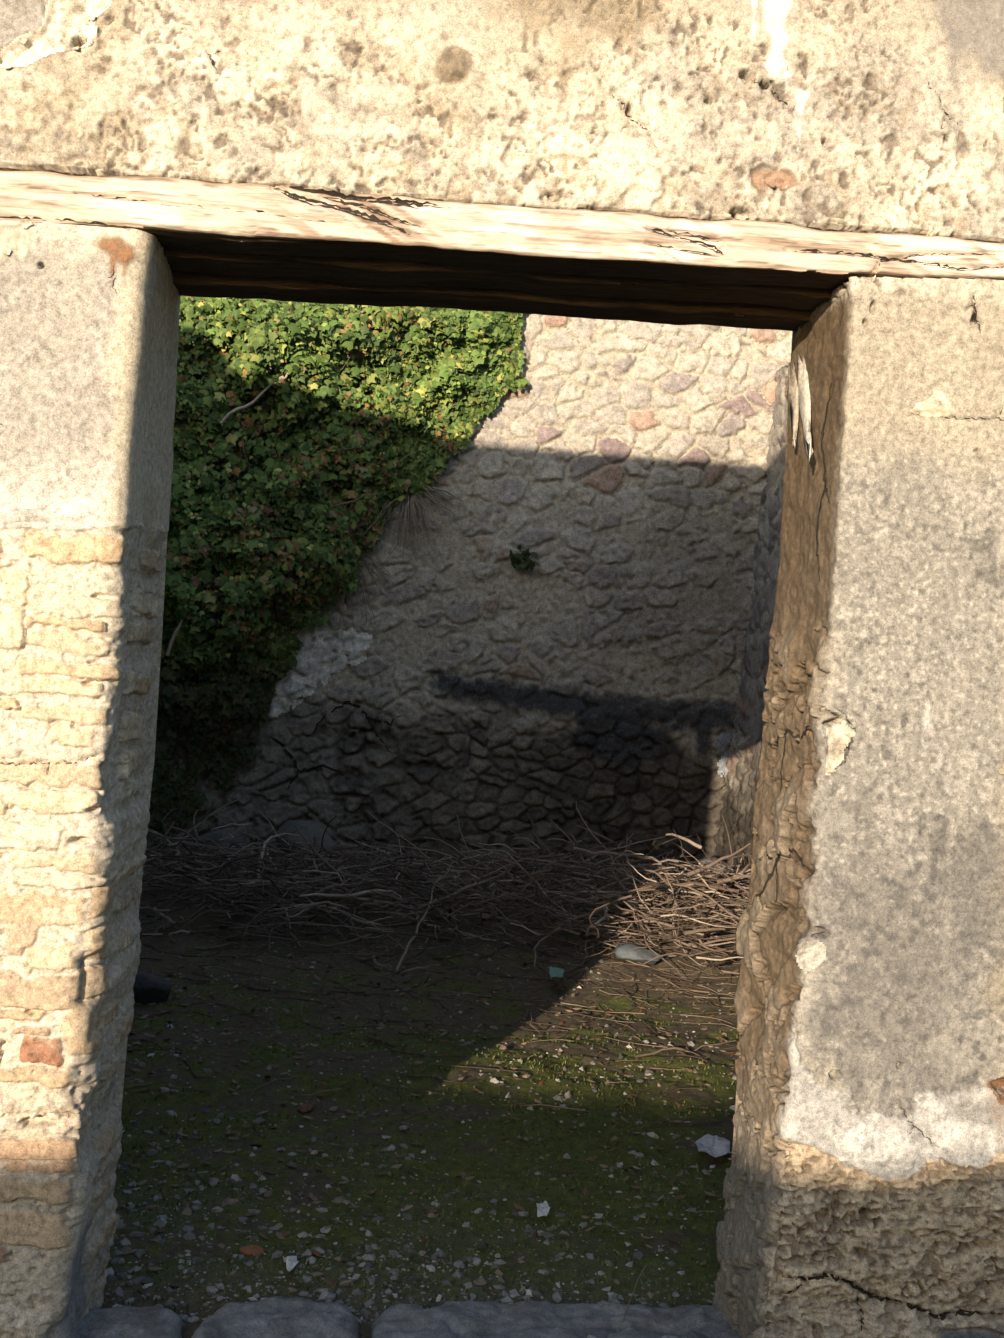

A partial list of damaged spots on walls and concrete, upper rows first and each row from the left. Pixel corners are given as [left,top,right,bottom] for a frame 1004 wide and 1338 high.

spalling [0,0,111,70]
crack [778,1272,1003,1331]